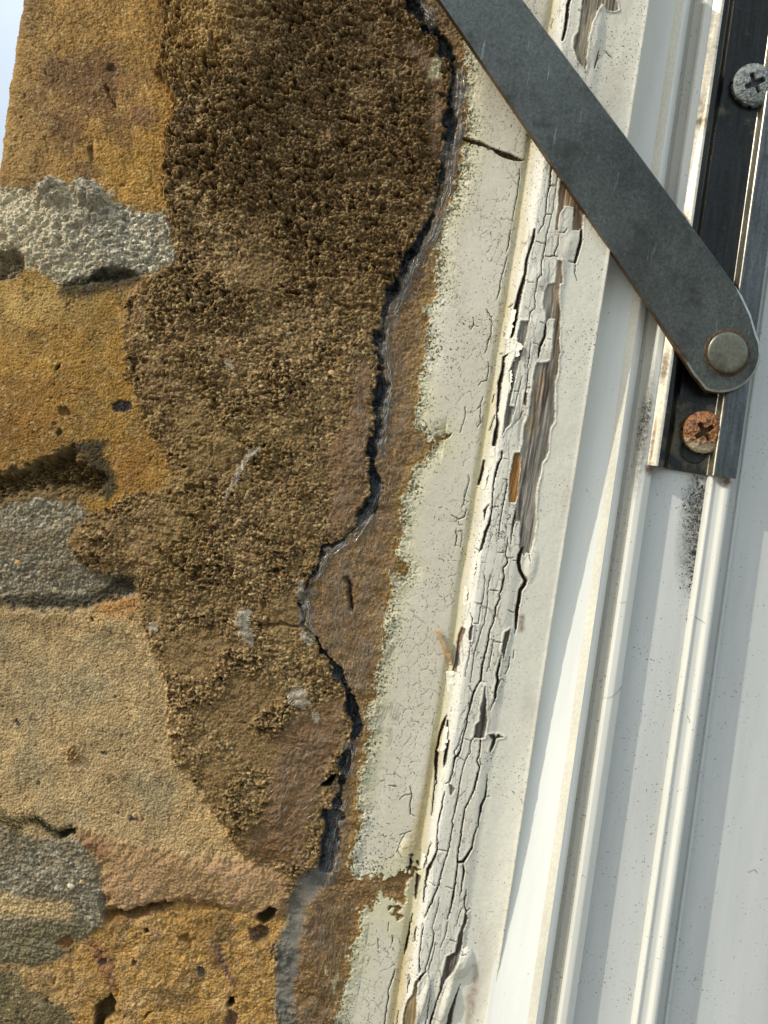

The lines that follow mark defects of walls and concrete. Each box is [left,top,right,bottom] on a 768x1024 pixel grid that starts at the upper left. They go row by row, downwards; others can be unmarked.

peeling [556,183,584,230]
peeling [502,260,564,555]
crack [298,0,582,1024]
peeling [435,625,474,691]
peeling [502,630,511,658]
peeling [440,726,448,752]
peeling [474,680,502,752]
peeling [415,853,426,898]
peeling [440,911,468,989]
peeling [403,978,419,1024]
peeling [446,987,460,1024]